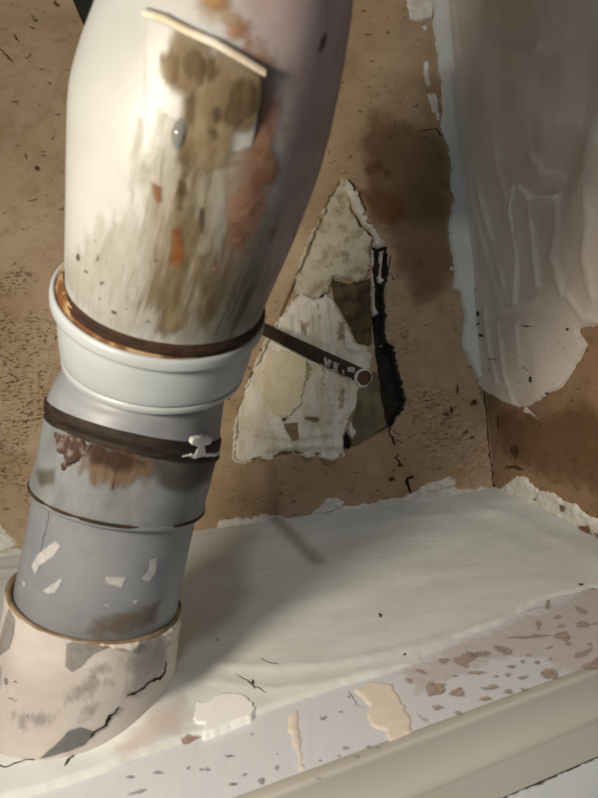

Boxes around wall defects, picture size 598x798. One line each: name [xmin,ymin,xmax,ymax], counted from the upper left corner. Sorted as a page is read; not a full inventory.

peeling [407,0,434,31]
peeling [423,61,441,121]
corrosion [227,119,277,249]
spalling [232,177,406,465]
corrosion [54,432,153,486]
crack [386,427,414,494]
crack [90,661,167,738]
peeling [181,693,256,744]
crack [236,673,267,693]
peeling [405,669,464,710]
peeling [439,615,571,700]
peeling [575,643,598,669]